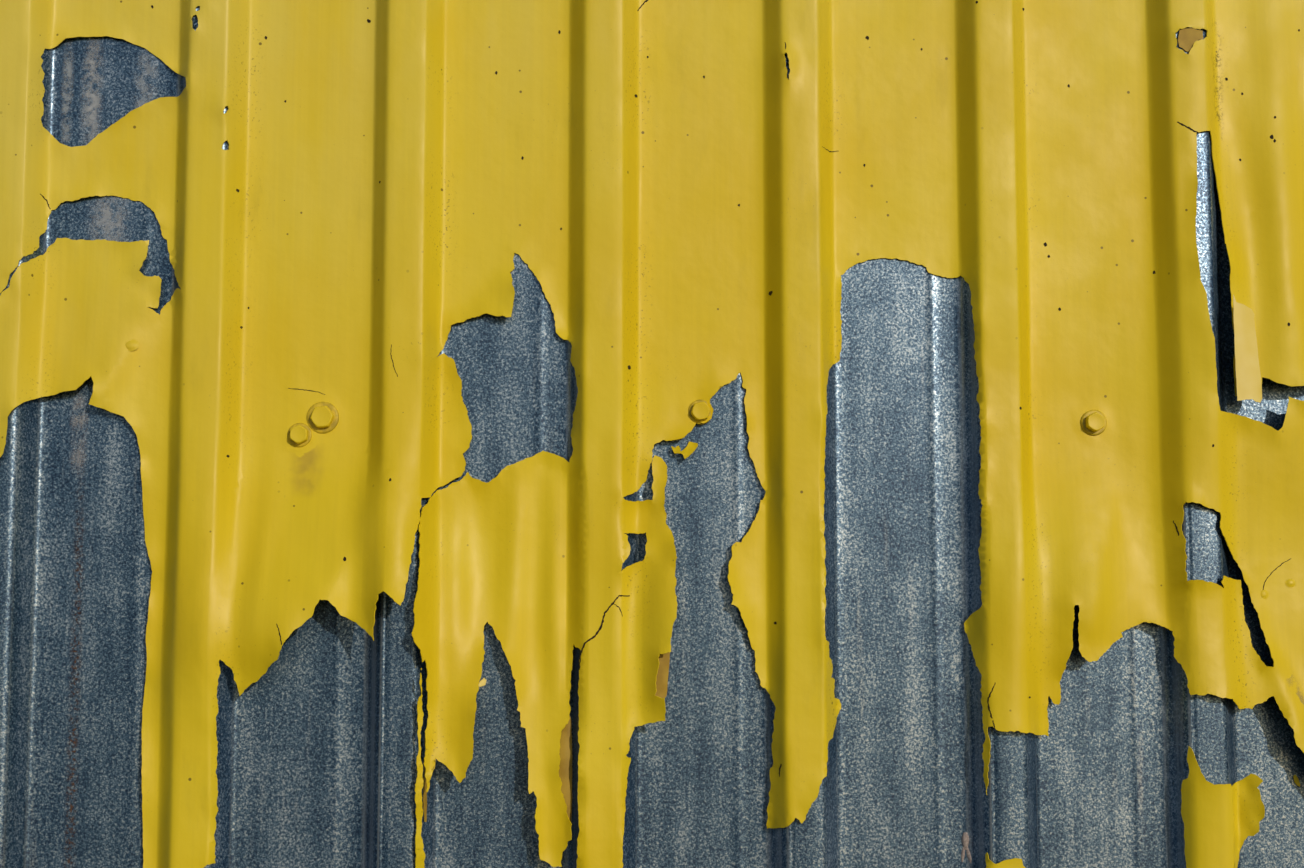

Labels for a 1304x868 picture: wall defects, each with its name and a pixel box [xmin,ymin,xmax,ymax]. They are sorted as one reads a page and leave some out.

peeling [0,196,181,868]
peeling [43,38,186,147]
peeling [204,253,584,868]
crack [579,595,630,670]
peeling [622,258,1304,868]
peeling [1196,132,1304,427]